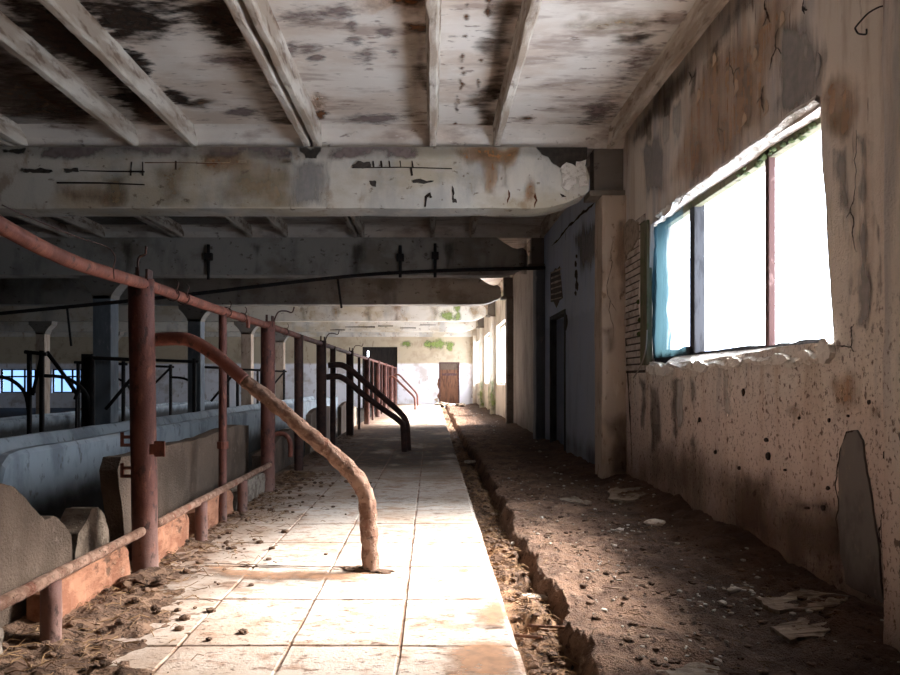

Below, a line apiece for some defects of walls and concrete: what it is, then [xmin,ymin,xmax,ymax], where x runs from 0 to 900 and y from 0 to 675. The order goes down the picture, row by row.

water stain [0,0,167,125]
water stain [80,0,292,125]
water stain [281,6,372,61]
water stain [468,2,521,125]
crack [726,1,782,112]
corrosion [460,147,518,188]
spalling [536,147,588,192]
crack [554,203,594,244]
crack [846,131,857,248]
peeling [550,266,563,308]
flaking render [624,214,645,373]
peeling [826,430,884,604]